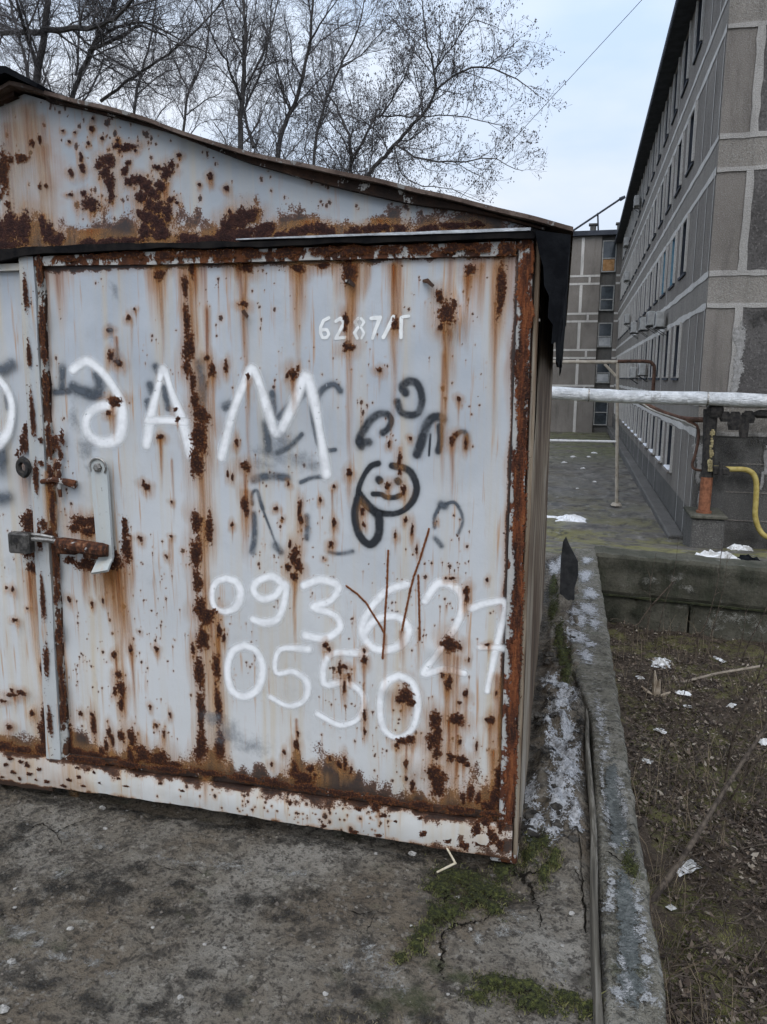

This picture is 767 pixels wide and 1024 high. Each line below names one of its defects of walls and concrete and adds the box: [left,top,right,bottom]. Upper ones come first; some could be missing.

rust [68,116,119,176]
rust [0,133,536,852]
water stain [527,680,551,783]
water stain [570,670,585,758]
crack [438,881,503,979]
crack [513,868,543,928]
water stain [598,902,608,995]